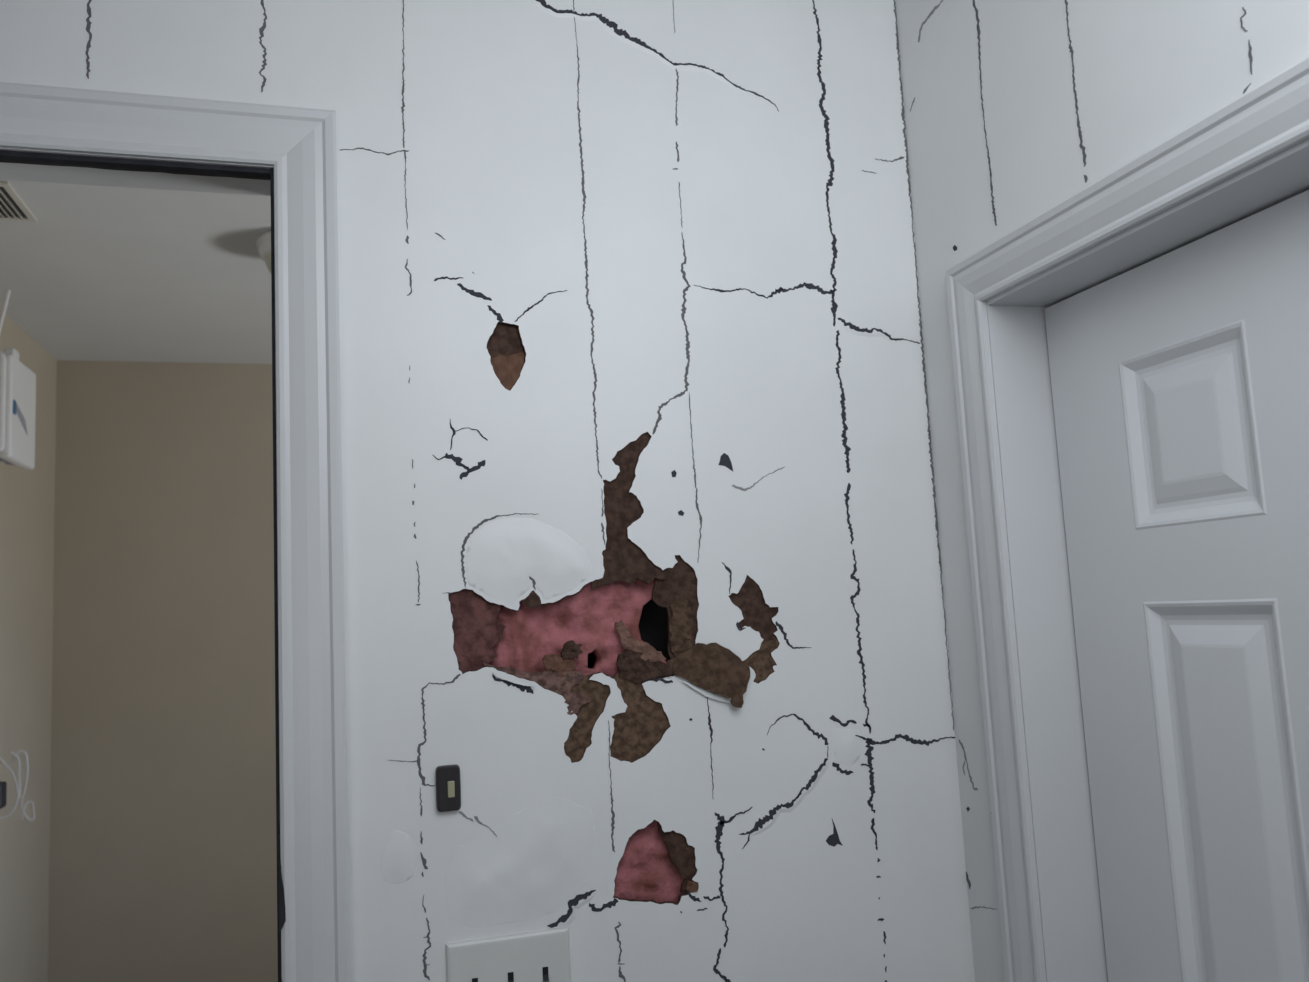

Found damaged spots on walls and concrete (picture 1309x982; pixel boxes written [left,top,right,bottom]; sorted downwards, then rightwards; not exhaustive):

crack [84,0,92,79]
crack [259,0,267,92]
crack [339,0,445,296]
crack [1065,0,1088,183]
crack [1240,7,1253,94]
spalling [434,272,568,391]
crack [412,420,536,606]
crack [492,675,534,694]
spalling [448,432,812,763]
crack [529,0,997,982]
crack [391,674,461,980]
spalling [613,820,699,905]